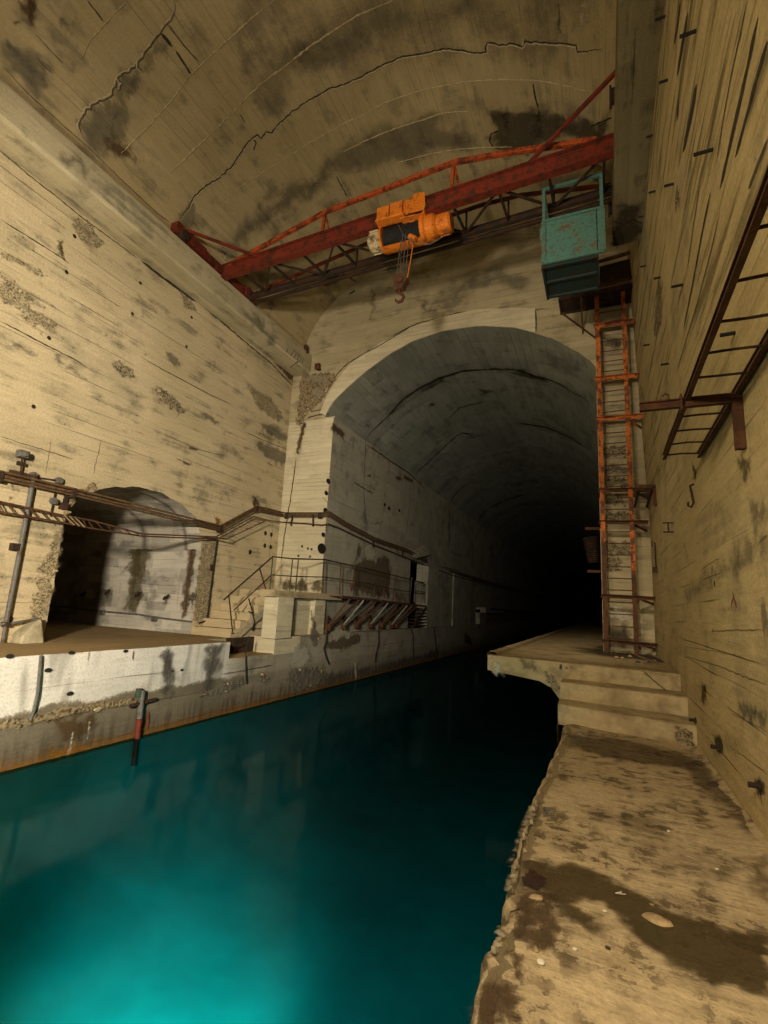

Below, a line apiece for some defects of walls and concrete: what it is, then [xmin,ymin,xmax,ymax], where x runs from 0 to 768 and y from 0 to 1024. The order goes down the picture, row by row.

crack [76,3,198,142]
crack [180,38,602,221]
water stain [491,109,604,150]
spalling [286,349,337,426]
spalling [30,531,63,619]
water stain [106,549,153,612]
spalling [193,542,217,622]
water stain [0,644,502,772]
water stain [525,861,768,994]